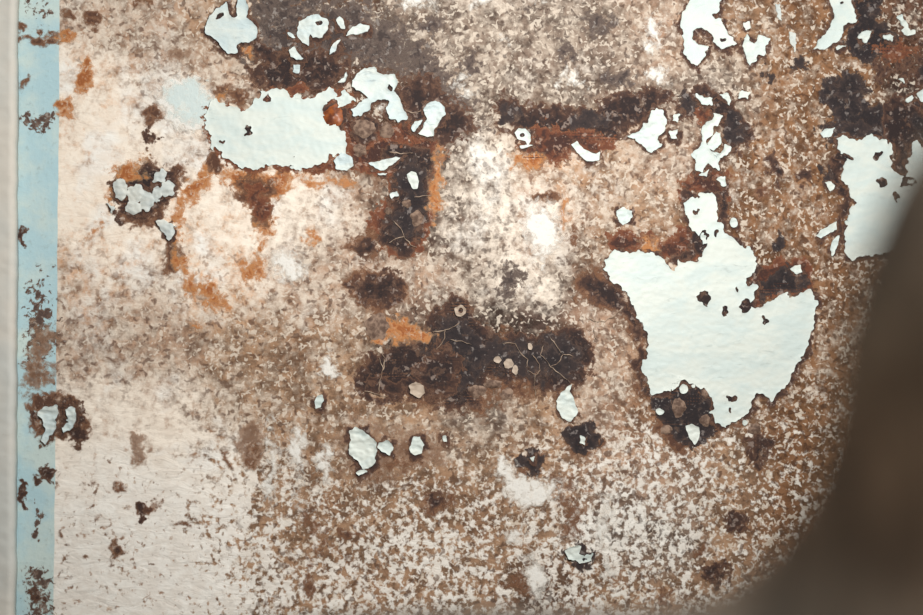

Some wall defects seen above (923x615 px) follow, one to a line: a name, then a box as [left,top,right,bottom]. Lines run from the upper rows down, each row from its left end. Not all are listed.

water stain [249,0,285,32]
peeling [200,63,453,175]
water stain [402,0,448,66]
water stain [454,50,483,97]
water stain [644,17,661,54]
peeling [673,0,772,74]
corrosion [105,0,756,418]
peeling [603,89,822,431]
peeling [815,127,921,263]
corrosion [18,265,92,451]
corrosion [572,264,720,457]
corrosion [17,463,57,542]